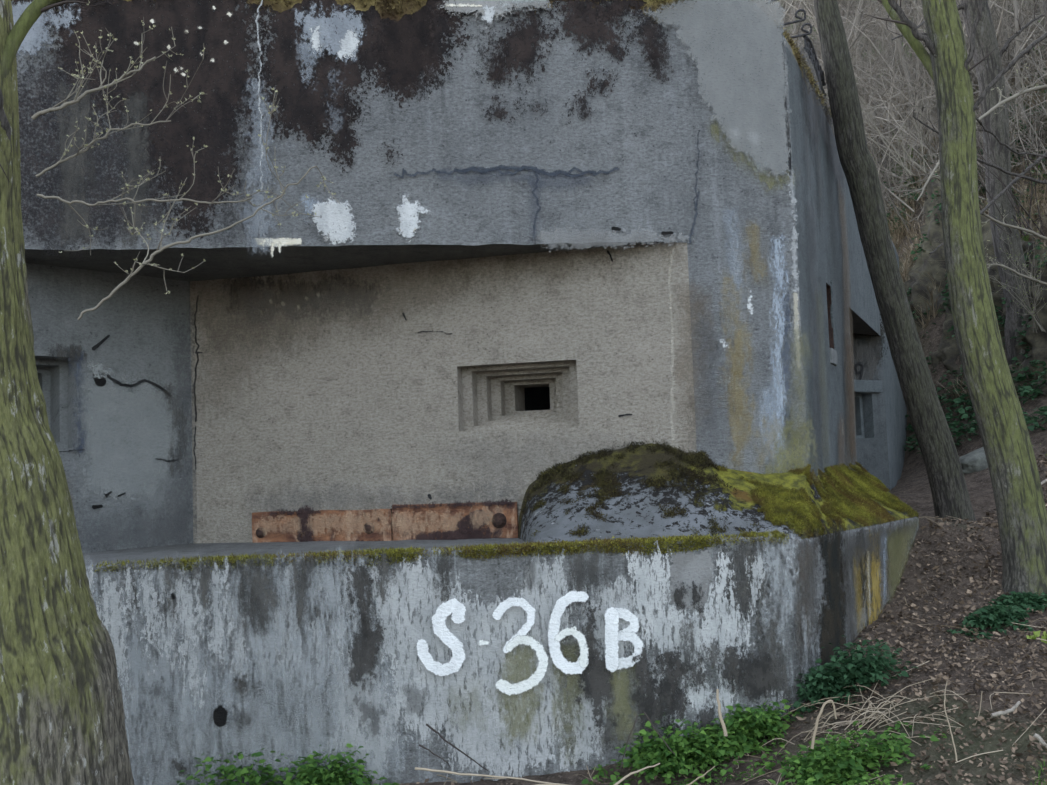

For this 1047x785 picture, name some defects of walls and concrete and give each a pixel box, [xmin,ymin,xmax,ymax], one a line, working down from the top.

damp [17,0,673,252]
crack [394,165,620,239]
efflorescence [769,236,794,470]
rust [269,505,321,542]
rust [391,499,512,540]
damp [120,553,396,643]
damp [432,555,453,601]
damp [814,522,869,671]
damp [573,535,799,752]